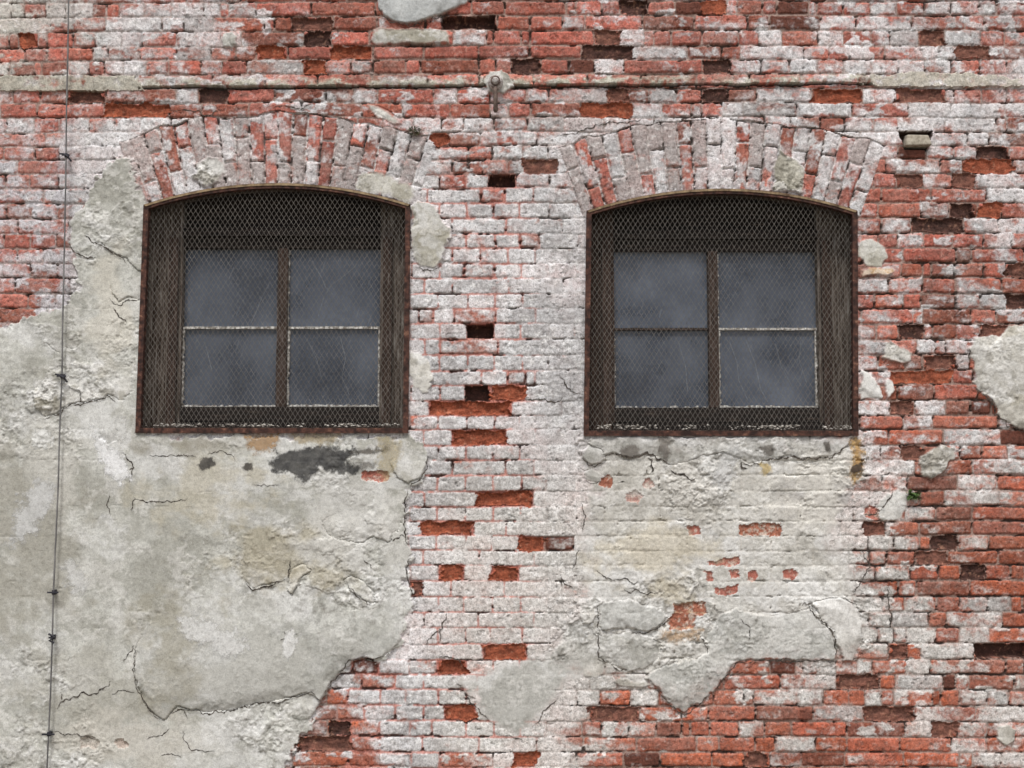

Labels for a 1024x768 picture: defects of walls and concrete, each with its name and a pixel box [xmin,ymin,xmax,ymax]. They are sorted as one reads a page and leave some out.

spalling [64,90,172,118]
crack [69,235,125,261]
peeling [83,204,143,302]
crack [48,389,114,418]
crack [106,450,236,513]
spalling [474,489,534,508]
spalling [419,520,475,536]
spalling [481,642,527,661]
crack [597,606,628,671]
crack [657,602,839,716]
spalling [973,642,1024,659]
crack [55,645,389,756]